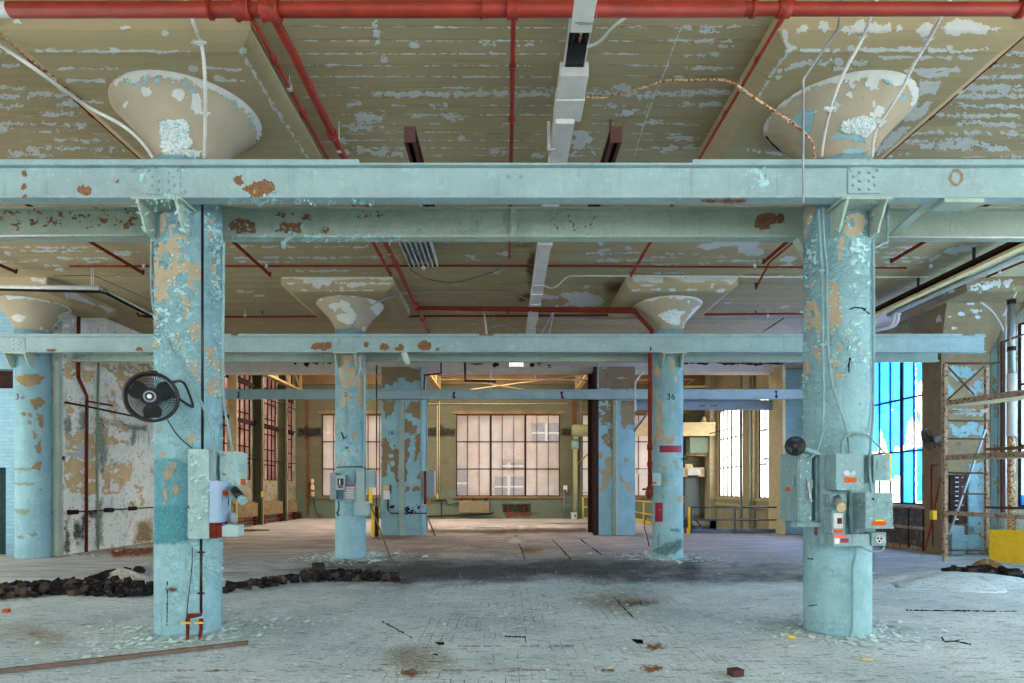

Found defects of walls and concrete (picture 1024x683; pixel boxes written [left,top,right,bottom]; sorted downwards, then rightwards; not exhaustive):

peeling [0,40,309,196]
peeling [299,19,566,159]
peeling [745,18,1024,189]
corrosion [0,207,138,233]
corrosion [228,218,256,234]
corrosion [233,175,275,200]
corrosion [272,212,312,234]
corrosion [754,212,785,231]
peeling [0,195,401,558]
corrosion [364,341,404,351]
peeling [381,367,420,492]
peeling [586,204,977,398]